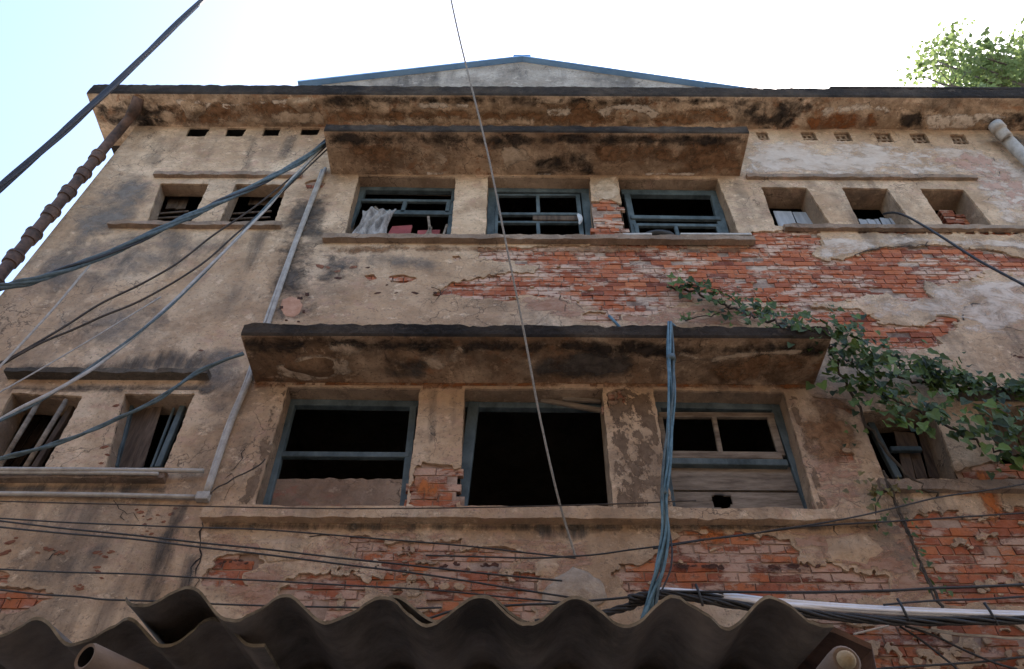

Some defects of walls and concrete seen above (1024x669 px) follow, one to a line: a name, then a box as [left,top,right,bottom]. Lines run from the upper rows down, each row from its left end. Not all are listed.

damp [141,98,324,124]
damp [330,102,745,199]
damp [275,199,325,294]
flaking render [316,264,419,294]
flaking render [433,142,1024,353]
damp [244,337,666,380]
damp [710,343,824,383]
flaking render [404,458,465,507]
peeling [601,389,671,508]
crack [192,522,203,586]
flaking render [201,526,591,621]
flaking render [611,507,1024,606]